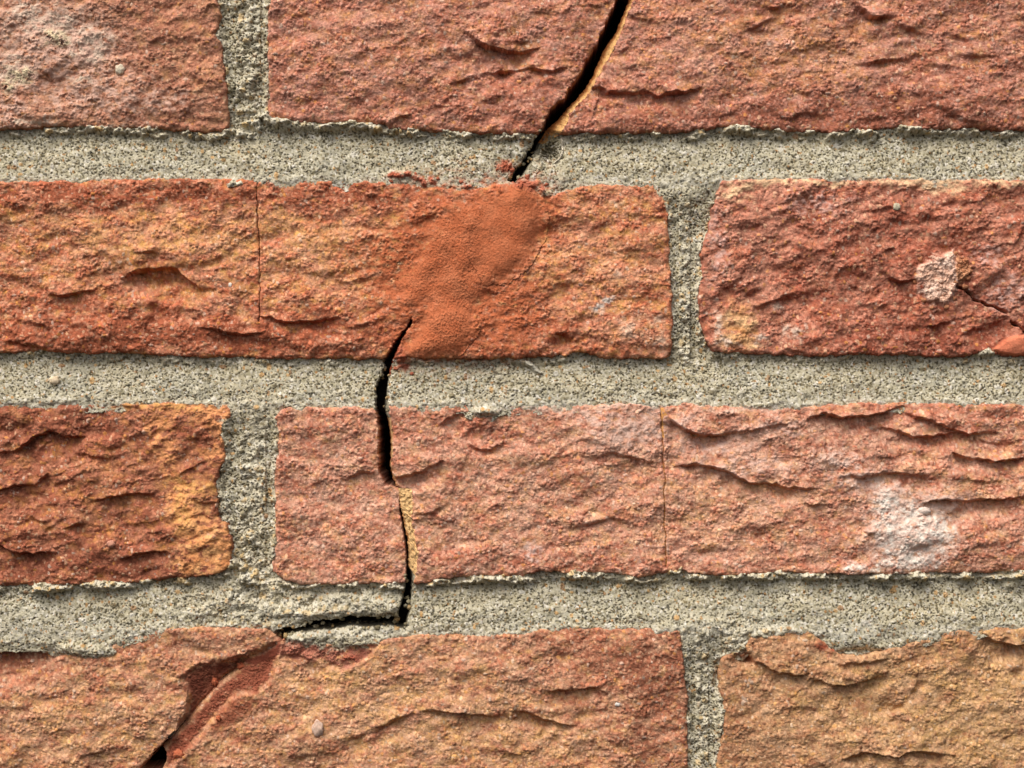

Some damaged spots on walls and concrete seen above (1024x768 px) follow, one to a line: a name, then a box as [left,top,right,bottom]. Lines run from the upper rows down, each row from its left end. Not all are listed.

crack [508,0,633,183]
crack [254,182,262,322]
crack [278,323,419,639]
crack [150,720,186,760]